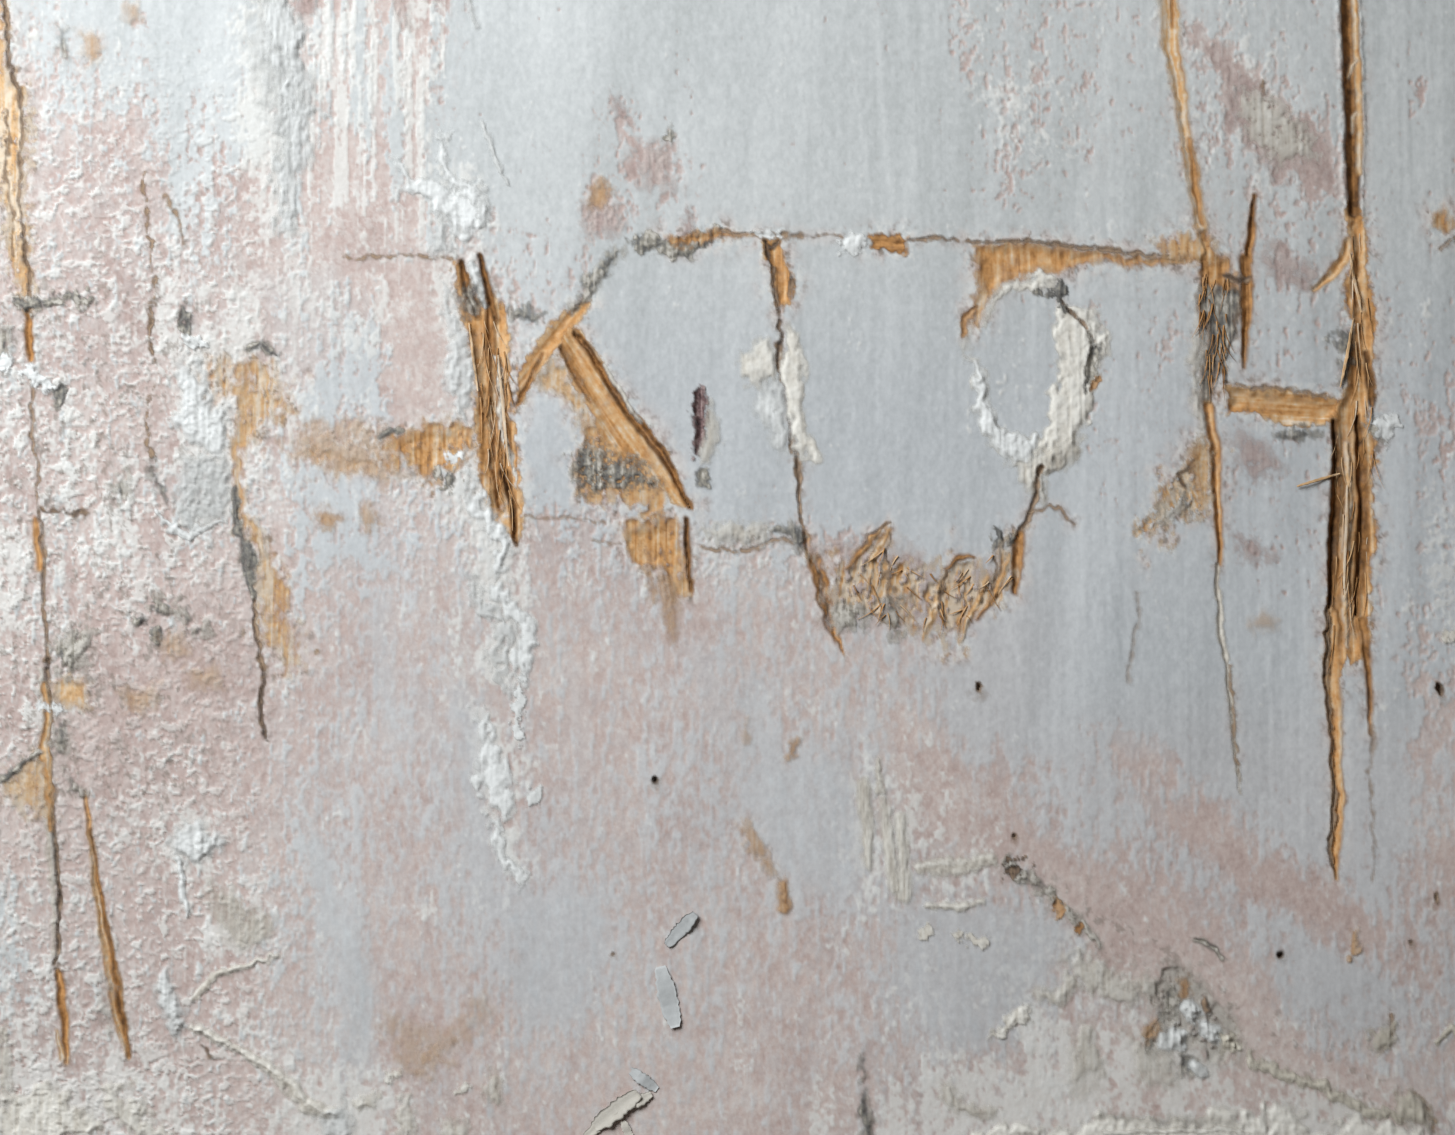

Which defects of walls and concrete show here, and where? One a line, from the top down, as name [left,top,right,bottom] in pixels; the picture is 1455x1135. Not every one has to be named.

crack [346,253,453,261]
crack [632,223,1216,264]
crack [0,0,130,1065]
peeling [385,121,719,886]
spalling [830,522,1024,641]
crack [1177,460,1195,487]
crack [253,599,267,739]